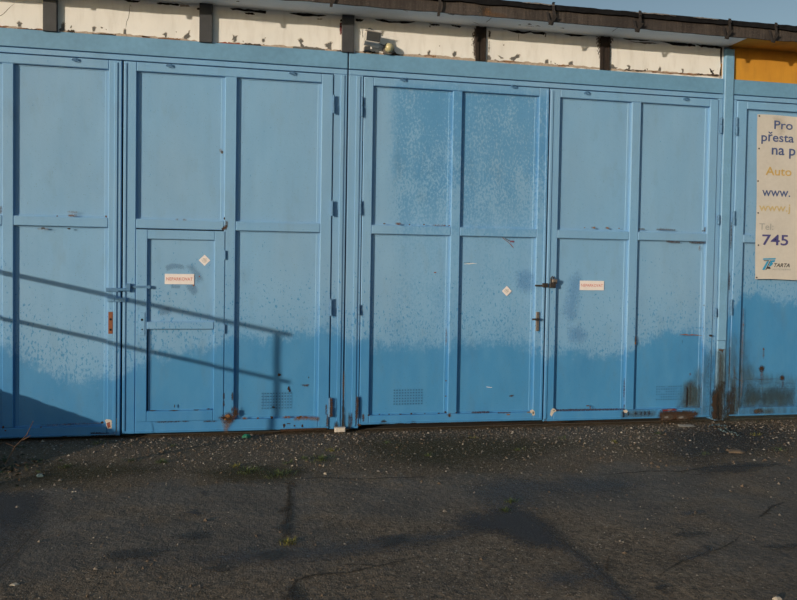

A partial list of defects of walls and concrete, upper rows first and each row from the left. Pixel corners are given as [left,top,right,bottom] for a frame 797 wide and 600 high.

spalling [58,22,196,41]
rust [711,349,744,422]
rust [204,393,246,429]
rust [280,397,333,432]
rust [556,388,697,421]